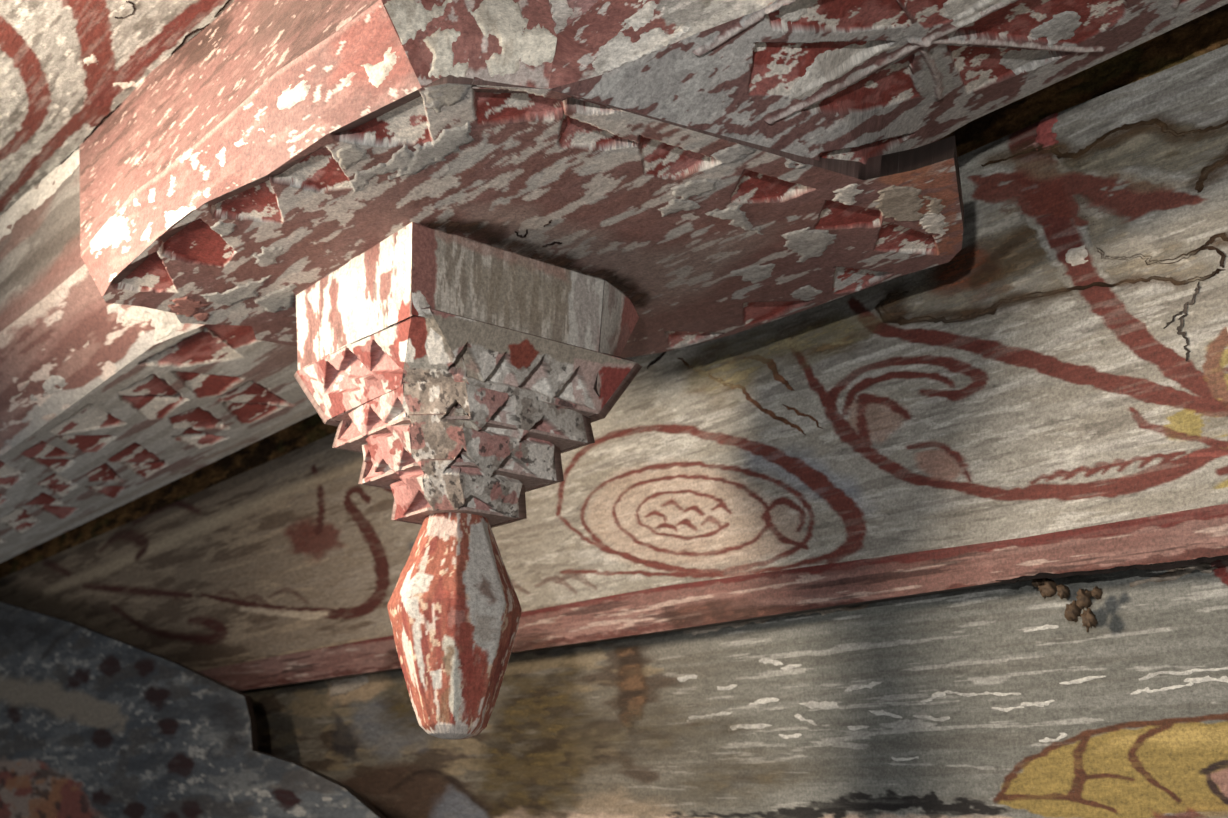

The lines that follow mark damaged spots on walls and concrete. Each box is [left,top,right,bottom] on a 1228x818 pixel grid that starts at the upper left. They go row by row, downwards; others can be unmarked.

peeling [277,80,311,110]
peeling [340,0,474,113]
peeling [467,0,573,77]
peeling [592,0,691,74]
peeling [788,40,900,100]
peeling [942,0,1015,28]
peeling [999,11,1082,75]
leakage [990,121,1228,186]
peeling [90,187,211,252]
peeling [832,184,949,238]
peeling [107,246,297,342]
crack [875,232,1228,362]